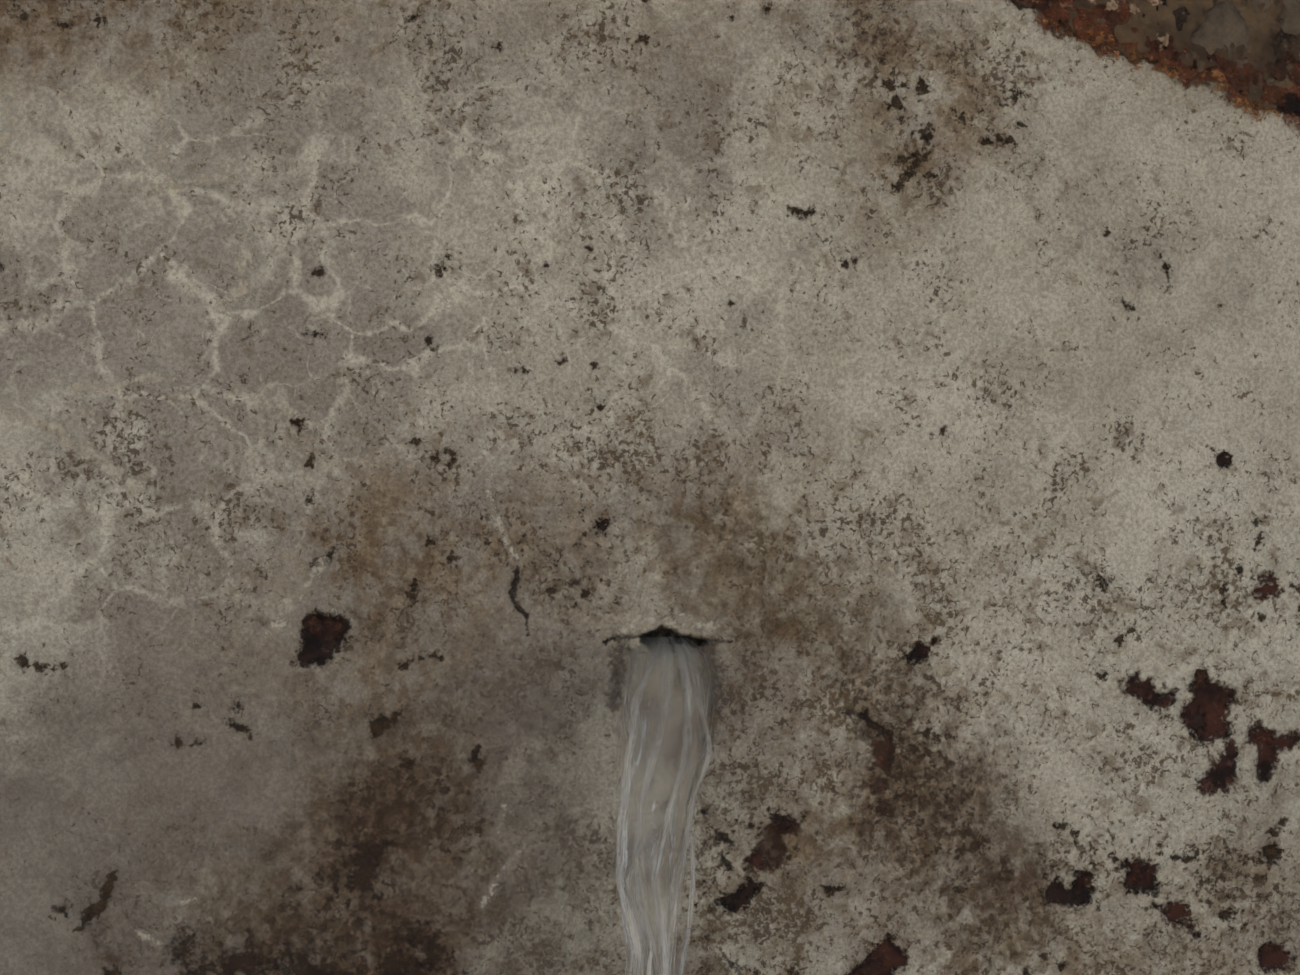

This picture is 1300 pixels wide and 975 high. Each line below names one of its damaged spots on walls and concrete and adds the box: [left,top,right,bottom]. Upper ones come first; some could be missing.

corrosion [1244,571,1297,604]
crack [603,632,652,644]
crack [696,638,732,646]
water stain [607,640,631,712]
corrosion [1118,662,1300,796]
corrosion [714,807,819,913]
corrosion [1259,842,1284,869]
corrosion [1112,841,1246,939]
corrosion [845,920,925,975]
corrosion [1257,927,1296,974]